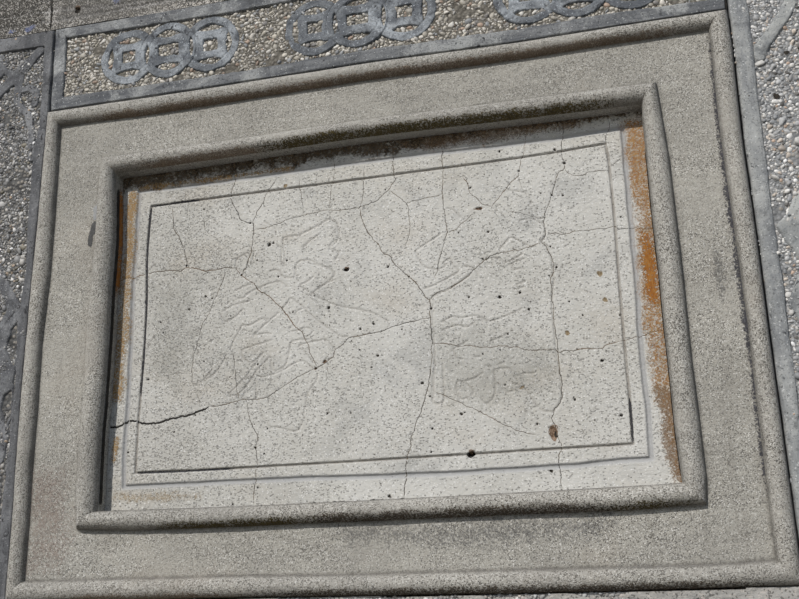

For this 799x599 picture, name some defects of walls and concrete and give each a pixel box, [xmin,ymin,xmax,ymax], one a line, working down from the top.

rust [112,166,294,403]
crack [99,125,680,511]
rust [622,116,682,482]